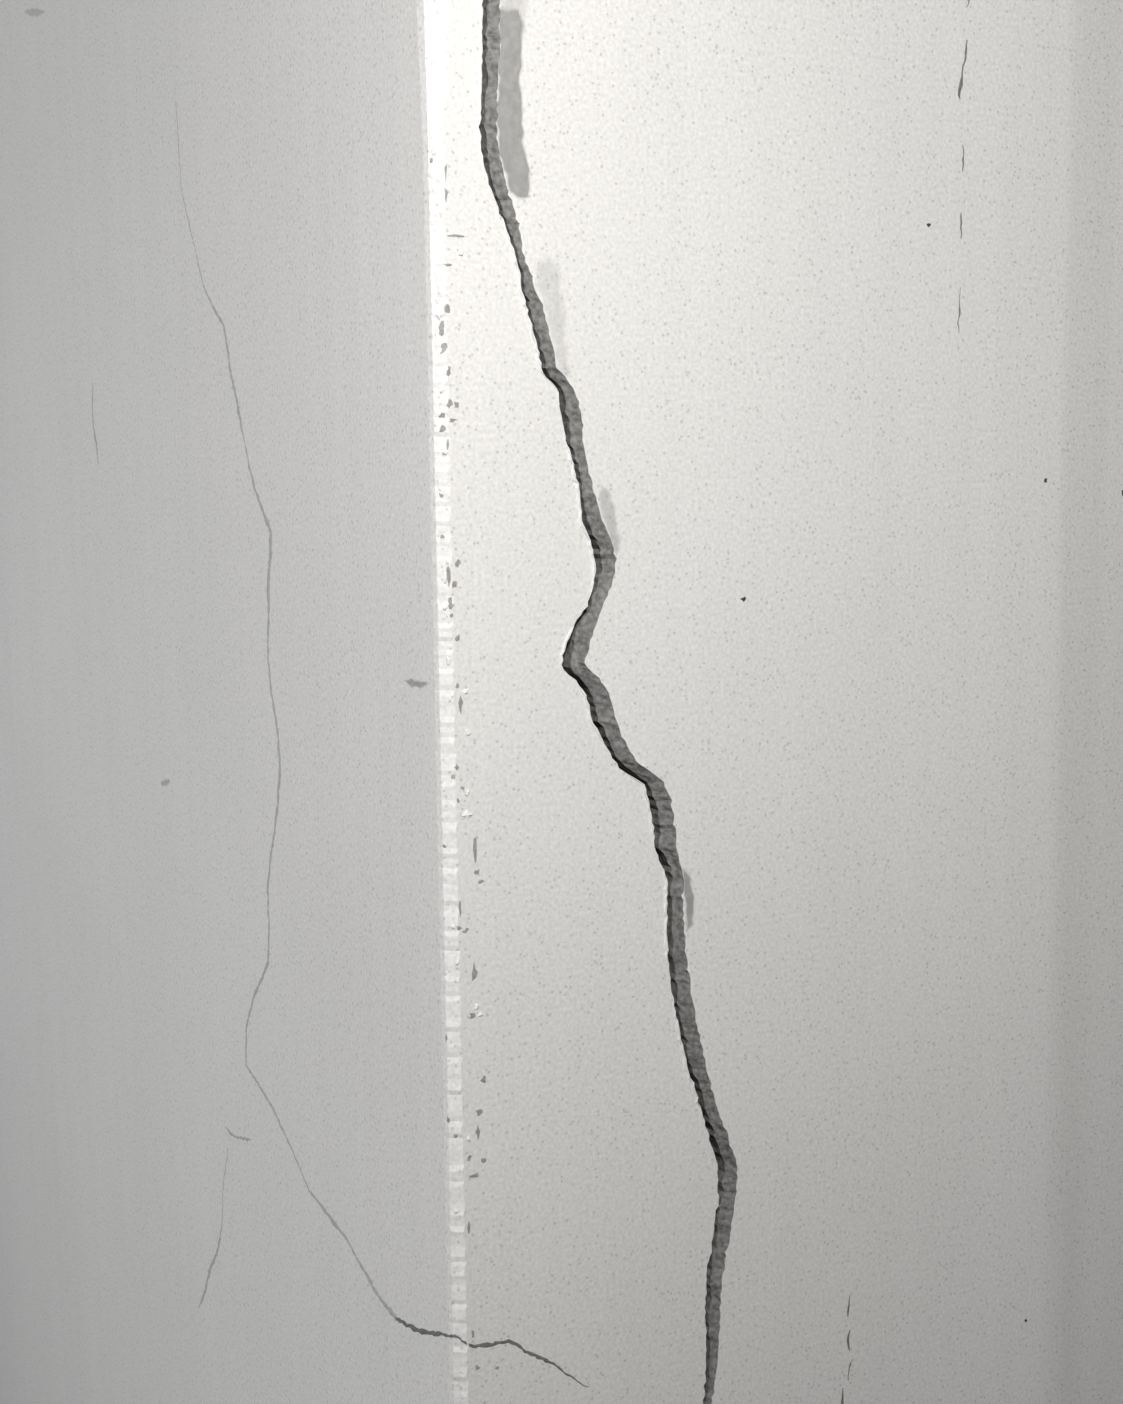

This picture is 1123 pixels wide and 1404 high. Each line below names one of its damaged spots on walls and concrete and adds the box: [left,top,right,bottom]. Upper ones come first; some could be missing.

crack [175,102,588,1387]
crack [477,0,738,1404]